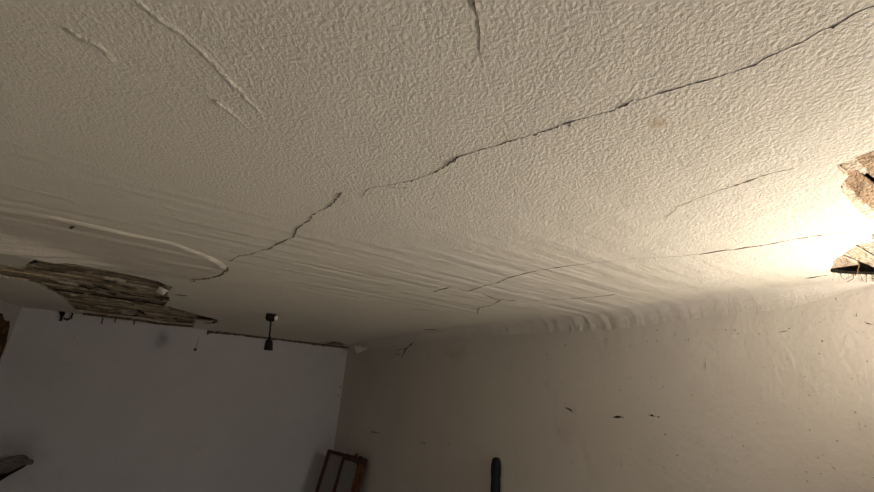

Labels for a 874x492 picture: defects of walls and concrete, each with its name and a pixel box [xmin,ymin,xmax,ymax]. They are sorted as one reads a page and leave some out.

crack [229,6,874,262]
flaking render [839,151,874,221]
flaking render [0,260,217,327]
crack [432,231,862,314]
flaking render [830,241,874,282]